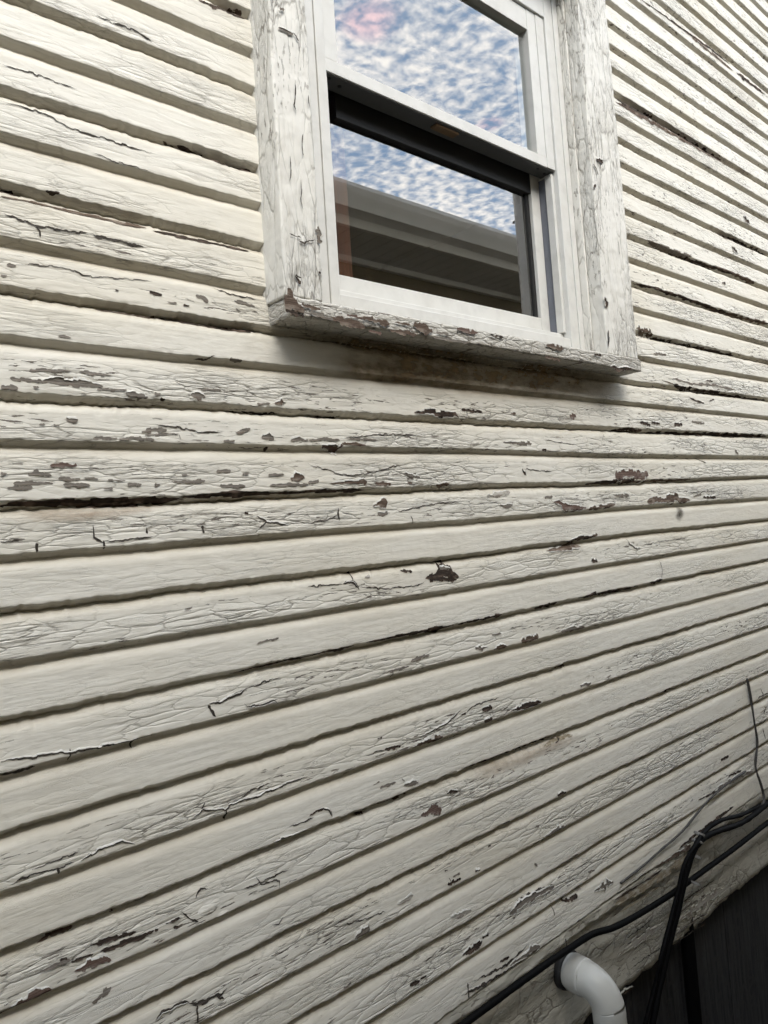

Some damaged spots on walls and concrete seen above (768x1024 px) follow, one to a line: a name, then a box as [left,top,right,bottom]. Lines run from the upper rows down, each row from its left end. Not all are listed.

peeling [284,274,478,344]
peeling [1,368,165,401]
crack [229,409,278,417]
peeling [1,462,142,490]
peeling [268,465,459,517]
crack [93,526,205,549]
peeling [425,560,459,583]
crack [208,677,281,717]
crack [0,734,152,776]
crack [11,839,135,885]
peeling [39,917,181,973]
crack [156,989,226,1023]